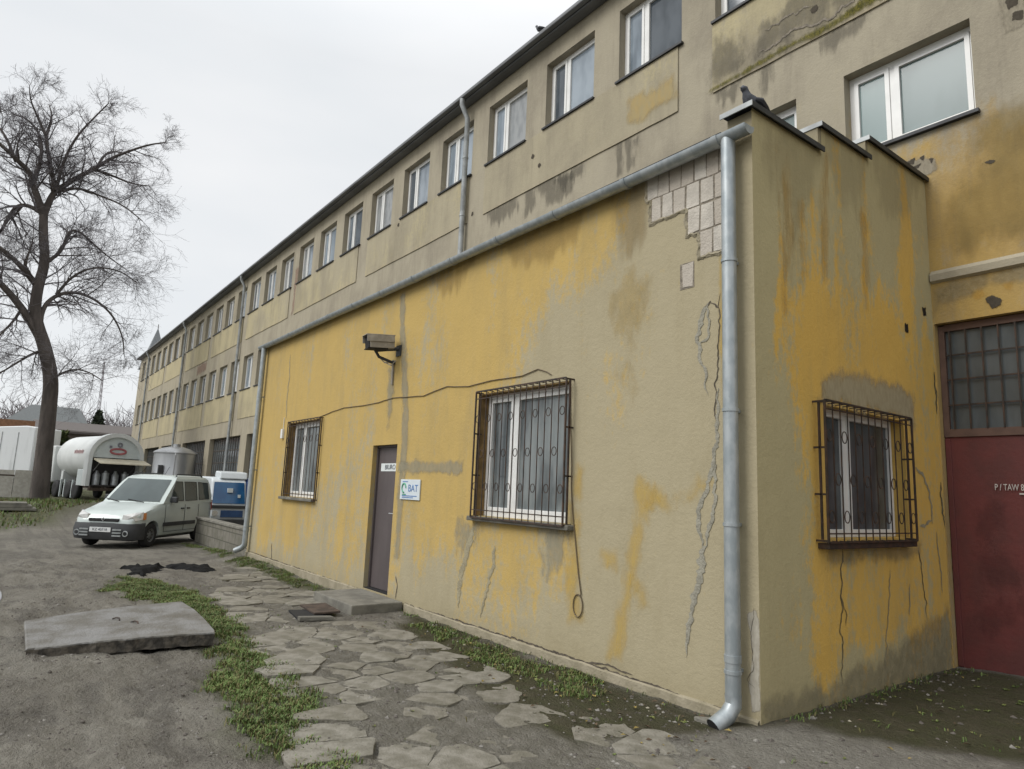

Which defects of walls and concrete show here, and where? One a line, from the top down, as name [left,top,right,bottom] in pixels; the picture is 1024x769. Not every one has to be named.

spalling [644,149,721,290]
spalling [907,155,937,175]
spalling [985,295,1002,309]
crack [685,296,721,657]
crack [249,544,339,582]
crack [395,527,720,708]
crack [839,549,847,681]